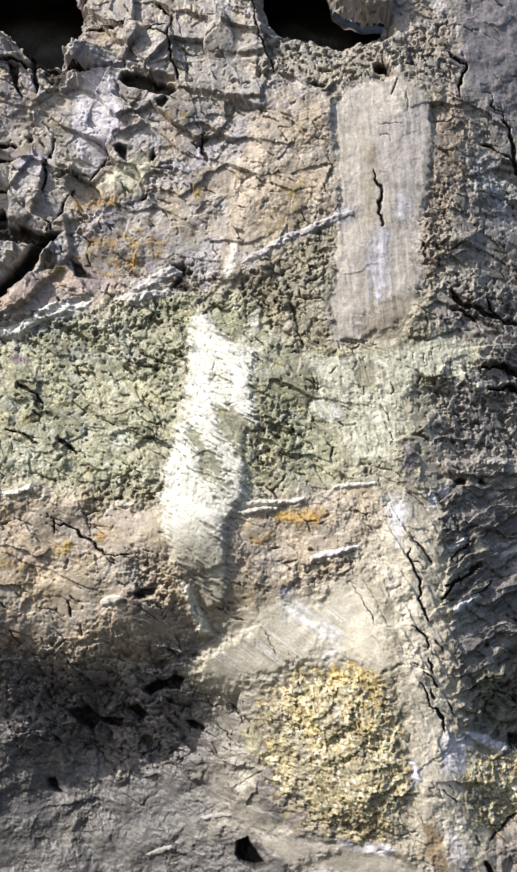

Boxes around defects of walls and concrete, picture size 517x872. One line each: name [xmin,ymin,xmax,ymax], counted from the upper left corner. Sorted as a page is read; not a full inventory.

crack [86,20,124,32]
crack [148,3,179,79]
hole [327,0,384,34]
crack [0,54,89,98]
crack [480,96,517,176]
crack [41,141,56,192]
crack [373,171,384,227]
crack [450,291,517,326]
crack [481,363,517,394]
rust [276,509,326,525]
crack [53,518,130,564]
crack [407,536,492,731]